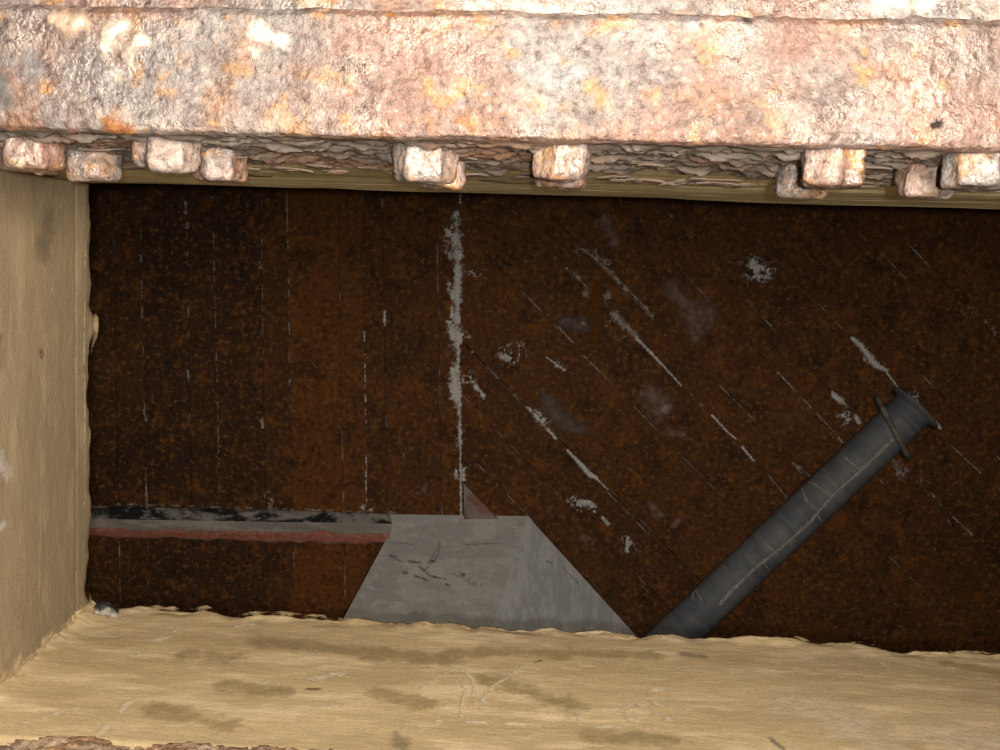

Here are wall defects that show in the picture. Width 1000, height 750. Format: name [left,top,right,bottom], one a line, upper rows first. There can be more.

rust [102,117,135,135]
peeling [248,163,394,175]
peeling [595,163,774,188]
damp [746,257,775,282]
damp [444,193,486,516]